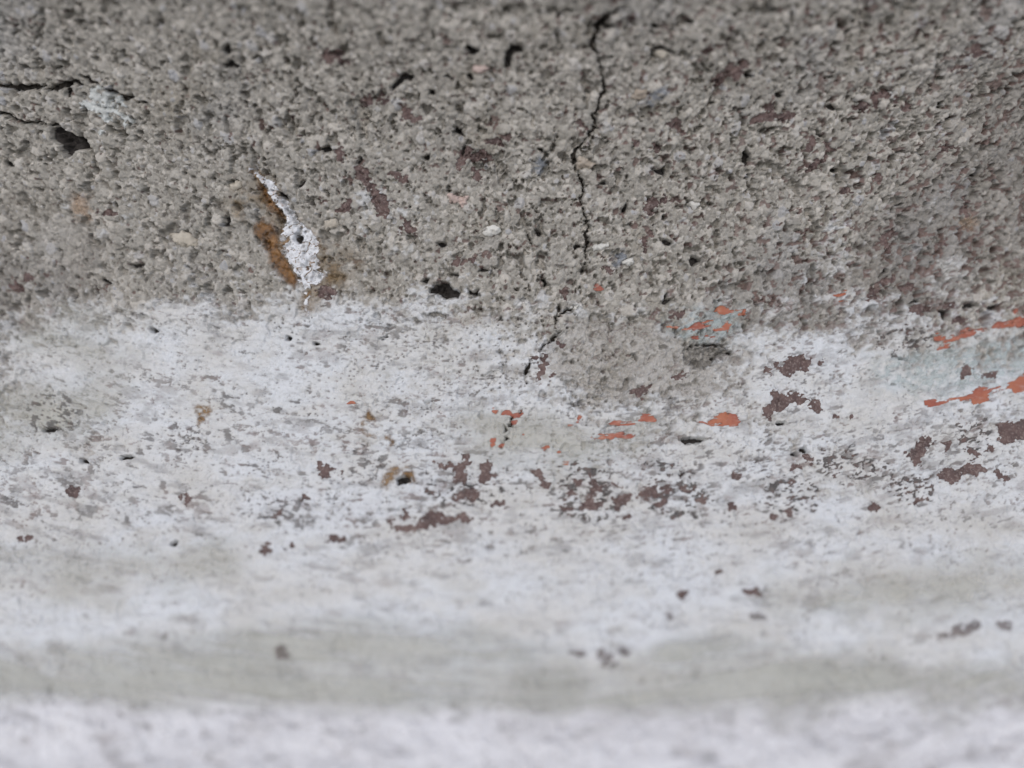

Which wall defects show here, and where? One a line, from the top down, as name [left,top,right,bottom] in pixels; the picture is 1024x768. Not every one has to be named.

crack [0,76,148,126]
crack [571,6,624,265]
rust [249,170,344,298]
crack [524,306,574,384]
peeling [933,315,1024,350]
peeling [762,354,854,426]
peeling [960,364,998,380]
peeling [317,461,343,479]
peeling [387,453,493,533]
peeling [559,472,708,520]
peeling [903,435,952,467]
peeling [987,419,1024,453]